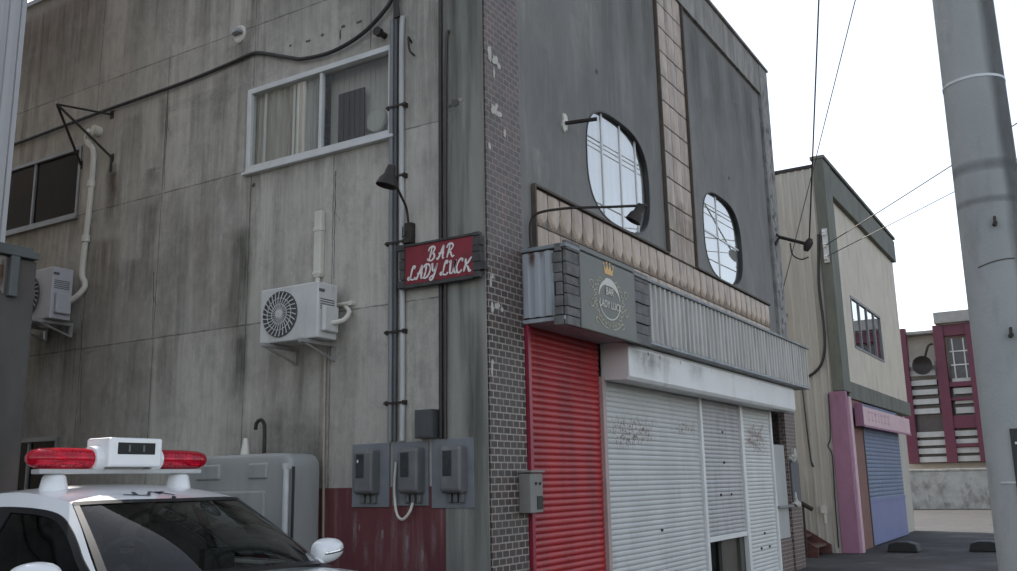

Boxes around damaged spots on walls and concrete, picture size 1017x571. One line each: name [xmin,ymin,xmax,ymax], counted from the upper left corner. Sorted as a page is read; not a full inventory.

peeling [487,46,501,78]